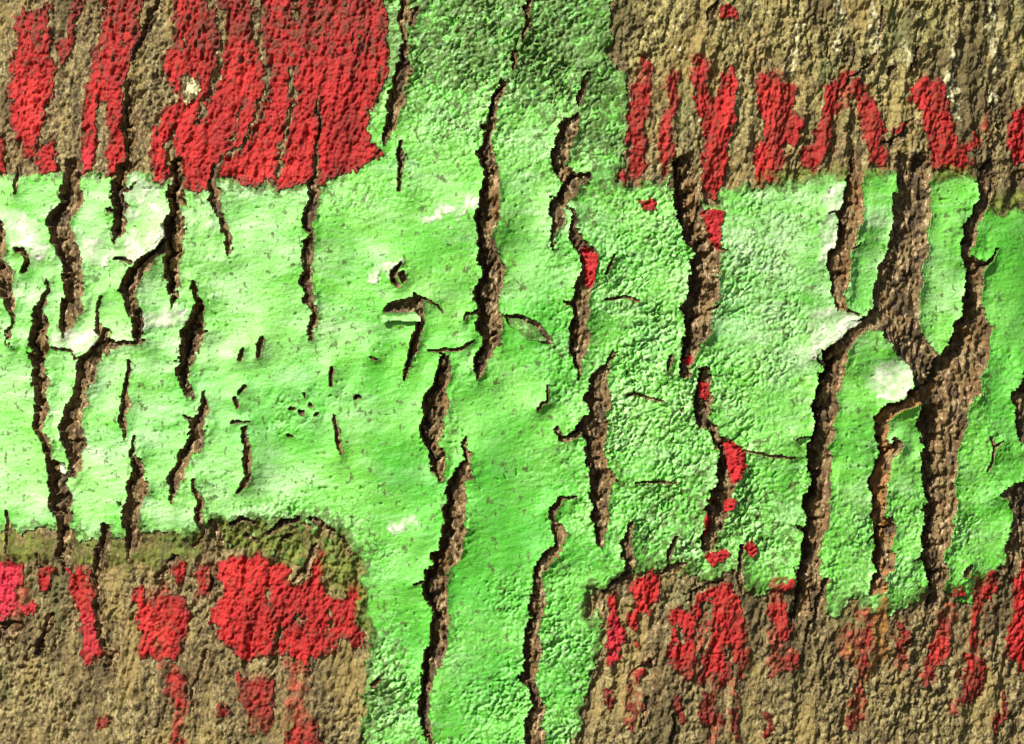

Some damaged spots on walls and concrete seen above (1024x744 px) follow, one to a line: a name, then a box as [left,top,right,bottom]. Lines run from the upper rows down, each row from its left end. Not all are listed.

spalling [178,75,201,105]
peeling [617,54,739,200]
peeling [705,0,738,22]
crack [0,0,356,673]
crack [403,0,533,744]
crack [517,71,678,744]
crack [661,149,867,642]
crack [867,158,1024,648]
peeling [0,558,103,666]
peeling [131,560,210,744]
peeling [604,568,660,683]
peeling [666,582,751,741]